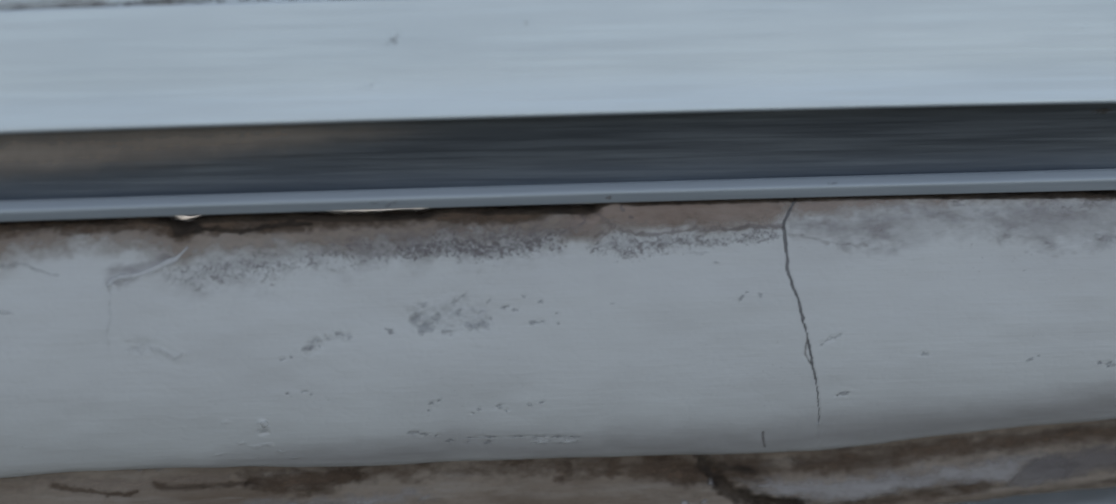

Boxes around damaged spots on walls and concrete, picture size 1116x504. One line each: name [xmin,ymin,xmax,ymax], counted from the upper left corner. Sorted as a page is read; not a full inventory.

leakage [0,198,945,260]
crack [782,201,820,417]